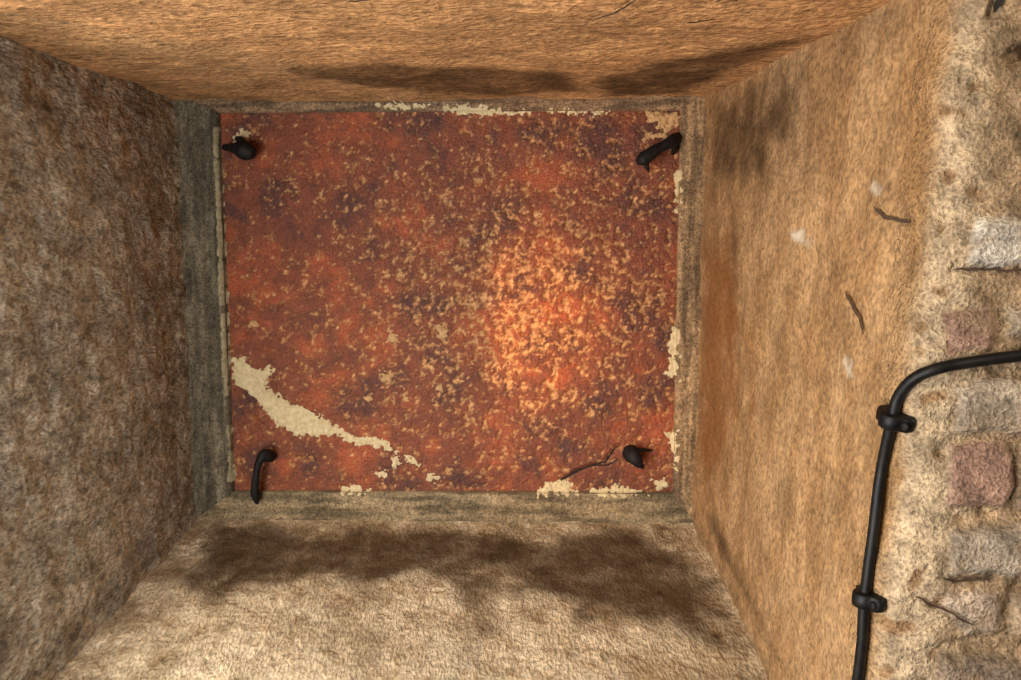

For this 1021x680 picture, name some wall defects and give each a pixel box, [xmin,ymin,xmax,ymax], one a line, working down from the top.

damp [339,68,521,95]
damp [606,49,760,94]
peeling [213,127,441,484]
peeling [435,324,448,339]
crack [560,445,620,481]
peeling [340,484,372,497]
damp [188,527,719,645]